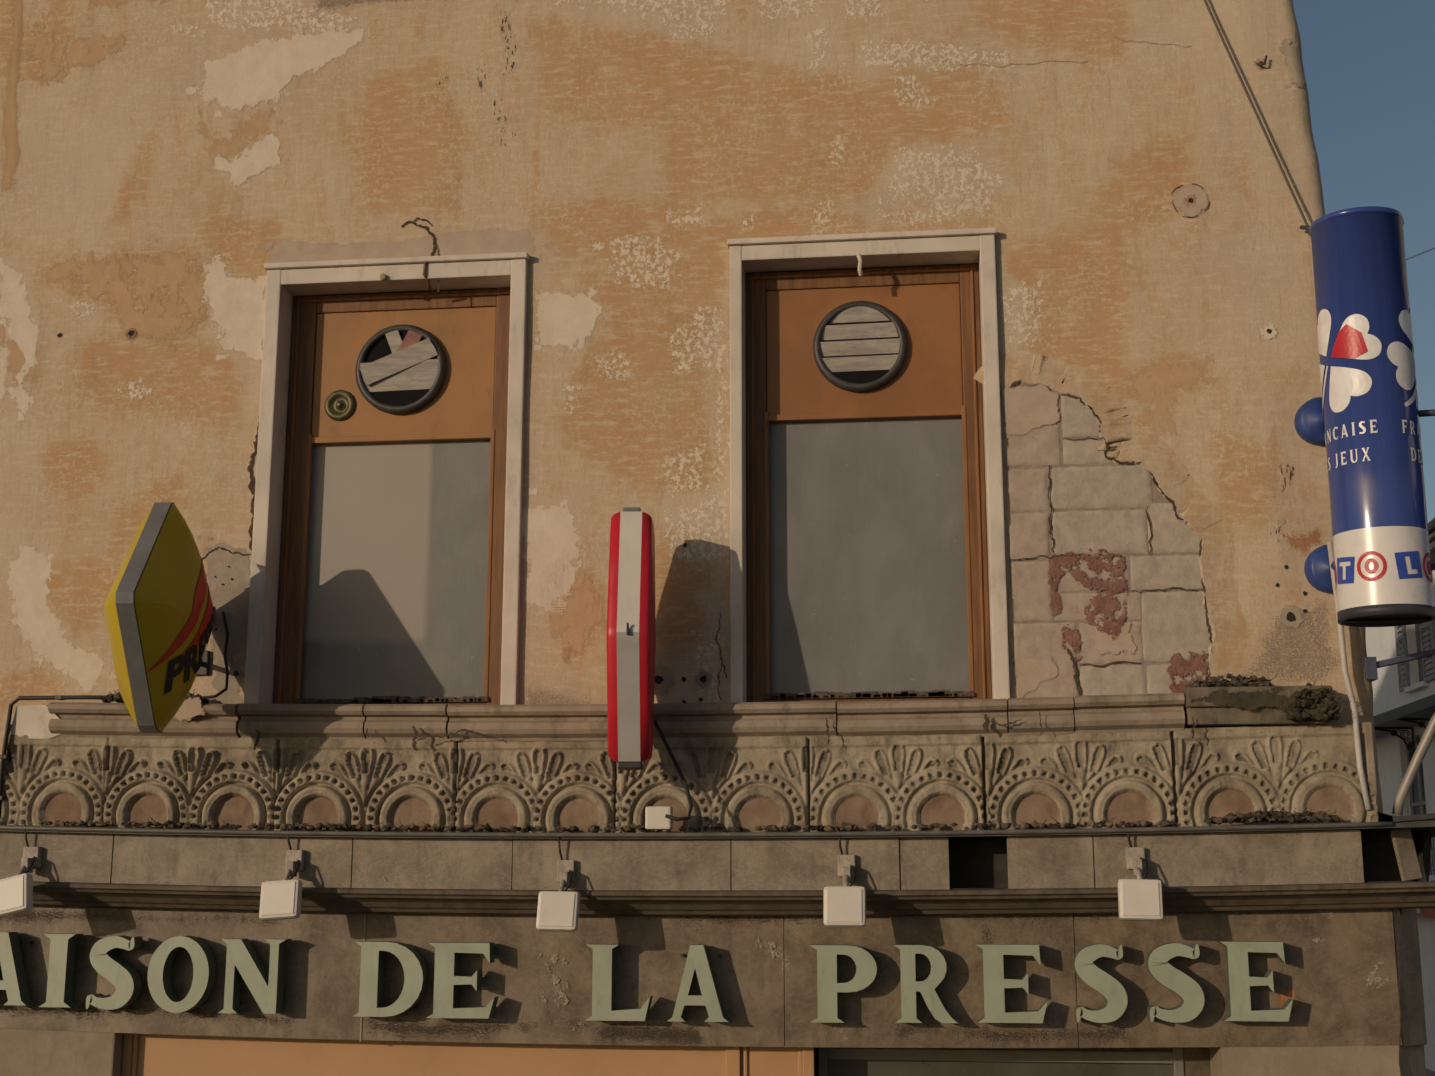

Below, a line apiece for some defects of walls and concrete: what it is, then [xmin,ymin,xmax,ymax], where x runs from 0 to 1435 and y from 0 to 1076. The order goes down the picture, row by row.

peeling [171,0,370,188]
crack [401,217,440,292]
peeling [592,203,711,290]
peeling [0,257,40,423]
peeling [533,287,632,381]
crack [202,417,259,560]
flaking render [973,276,1249,698]
peeling [3,541,116,692]
crack [412,726,490,751]
crack [824,718,832,744]
crack [983,711,1043,735]